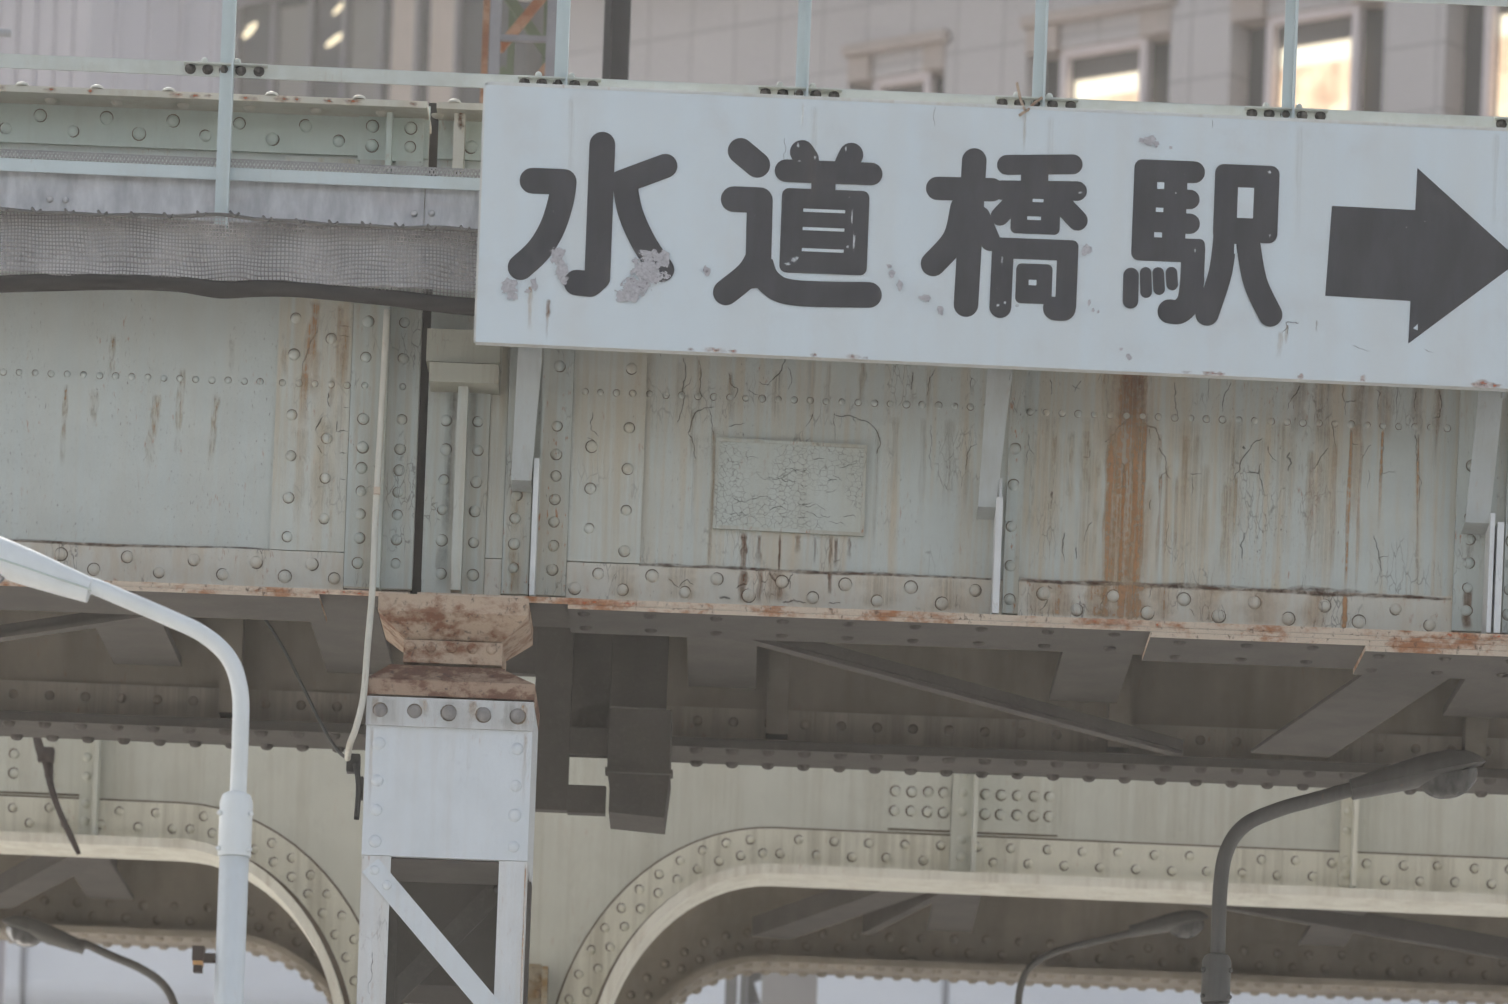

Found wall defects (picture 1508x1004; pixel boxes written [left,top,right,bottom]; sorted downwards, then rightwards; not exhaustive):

peeling [501,277,538,301]
peeling [550,248,569,285]
peeling [615,249,671,303]
crack [678,361,880,524]
corrosion [1021,374,1443,628]
corrosion [646,535,990,598]